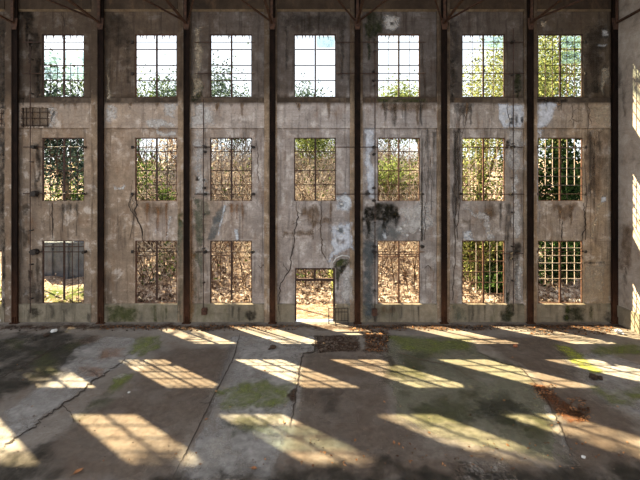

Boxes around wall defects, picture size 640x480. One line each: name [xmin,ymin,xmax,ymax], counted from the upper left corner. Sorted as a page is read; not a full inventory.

spalling [385,17,399,29]
water stain [379,98,428,115]
peeling [538,103,556,136]
peeling [499,104,523,238]
crack [128,192,143,241]
peeling [337,193,351,210]
crack [278,202,301,317]
peeling [329,224,352,261]
crack [2,352,130,448]
crack [172,335,240,479]
crack [289,341,316,423]